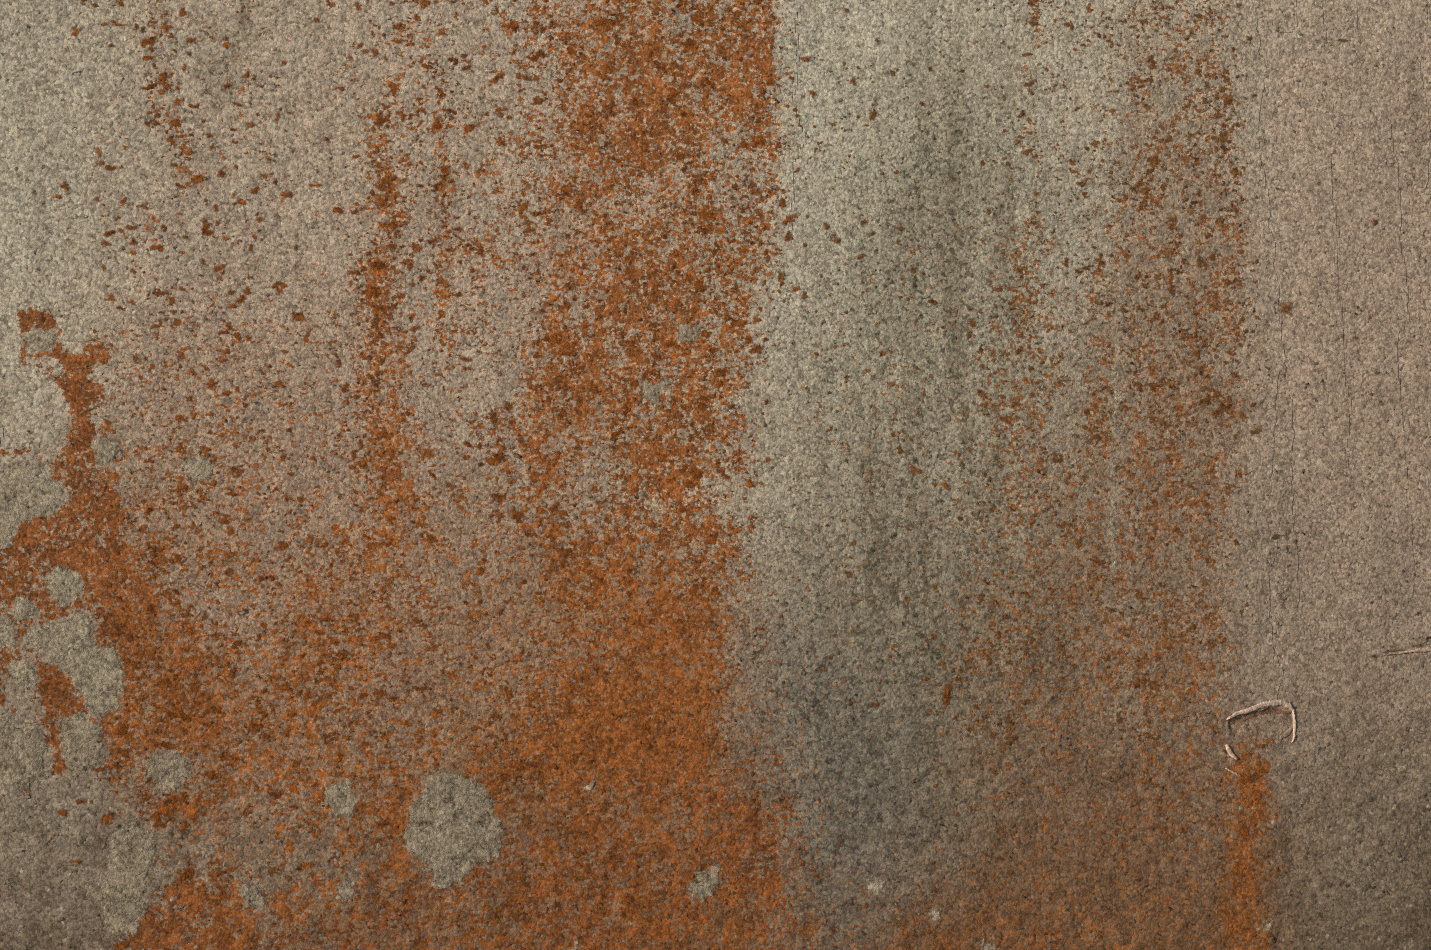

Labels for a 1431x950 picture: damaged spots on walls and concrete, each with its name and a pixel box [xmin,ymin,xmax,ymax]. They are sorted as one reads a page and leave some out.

corrosion [896,226,945,312]
corrosion [881,418,931,480]